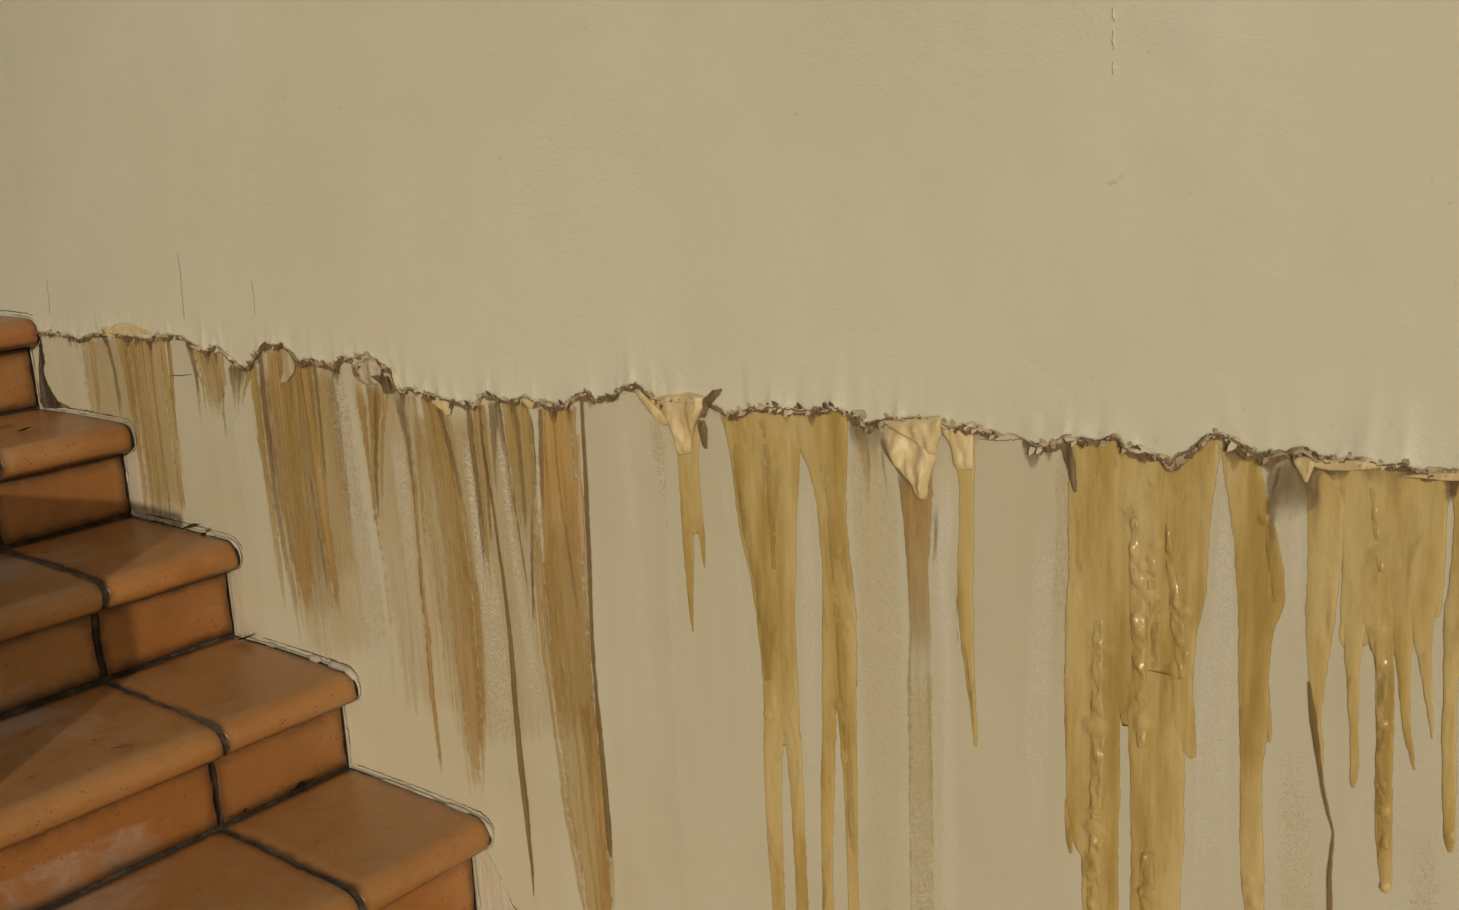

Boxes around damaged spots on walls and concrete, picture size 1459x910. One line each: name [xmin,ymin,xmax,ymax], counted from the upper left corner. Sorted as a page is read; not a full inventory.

spalling [126,449,148,515]
spalling [230,566,266,639]
damp [325,372,396,710]
damp [388,413,545,788]
peeling [36,323,1000,501]
damp [613,409,978,910]
damp [1019,436,1459,910]
peeling [1023,428,1459,501]
spalling [477,850,515,910]